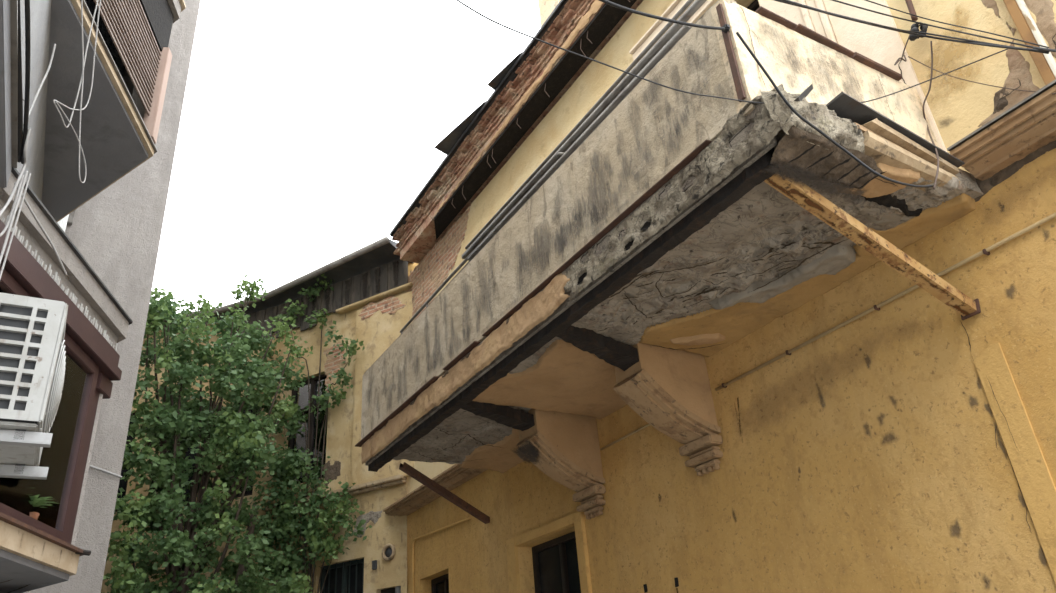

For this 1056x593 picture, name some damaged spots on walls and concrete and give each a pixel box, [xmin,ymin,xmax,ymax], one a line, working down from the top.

peeling [1024,0,1056,58]
peeling [978,0,1040,127]
corrosion [767,178,836,227]
spalling [562,84,1056,345]
peeling [653,333,725,350]
spalling [393,409,513,464]
crack [961,322,1046,564]